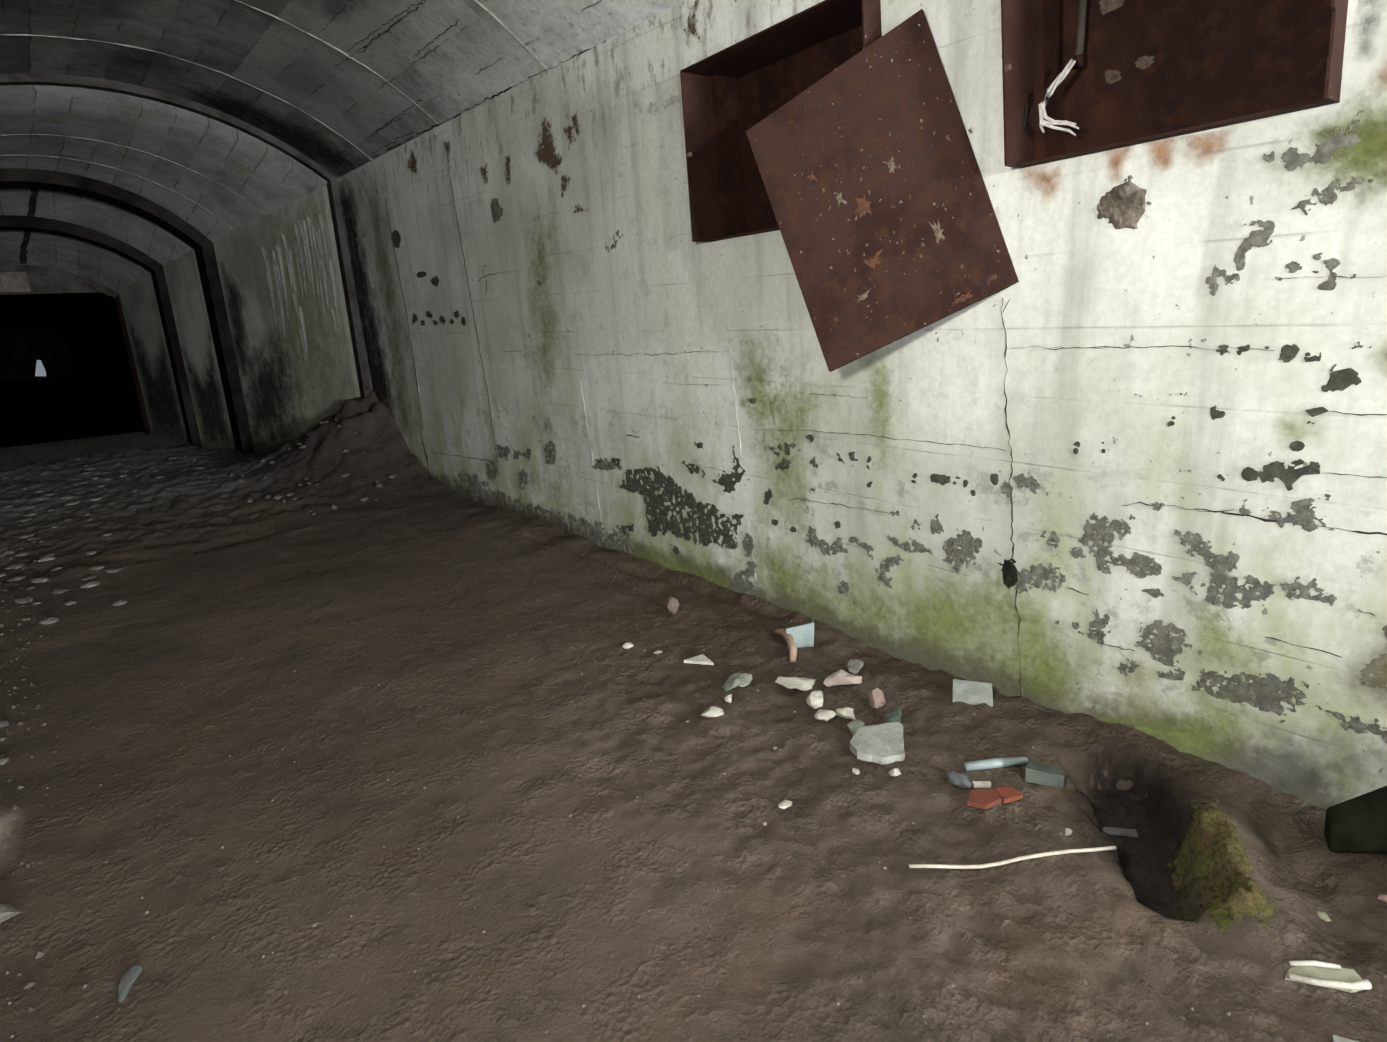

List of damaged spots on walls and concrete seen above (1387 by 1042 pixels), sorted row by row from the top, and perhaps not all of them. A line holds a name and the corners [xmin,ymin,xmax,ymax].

rust [1156,139,1170,166]
water stain [1318,120,1387,183]
rust [807,164,872,221]
rust [890,194,946,258]
spalling [1096,175,1152,229]
rust [830,234,883,313]
peeling [458,440,758,595]
crack [758,297,1275,696]
crack [1123,502,1387,535]
peeling [998,513,1337,609]
crack [1266,637,1343,658]
peeling [1117,620,1387,743]